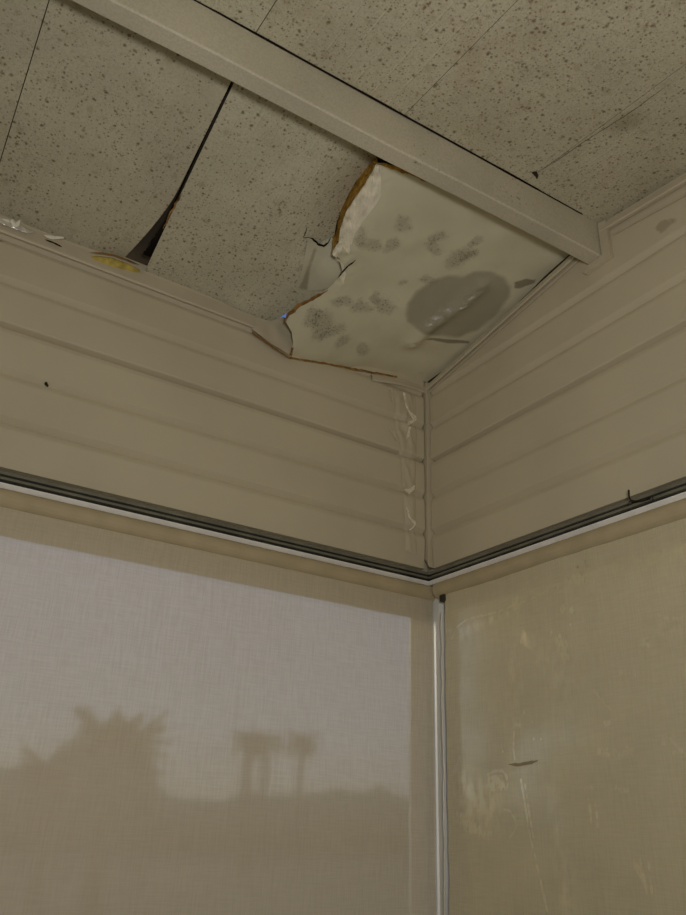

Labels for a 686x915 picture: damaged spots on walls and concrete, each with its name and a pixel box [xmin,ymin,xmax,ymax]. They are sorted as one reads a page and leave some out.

crack [143,81,232,257]
crack [303,228,331,247]
crack [194,0,674,214]